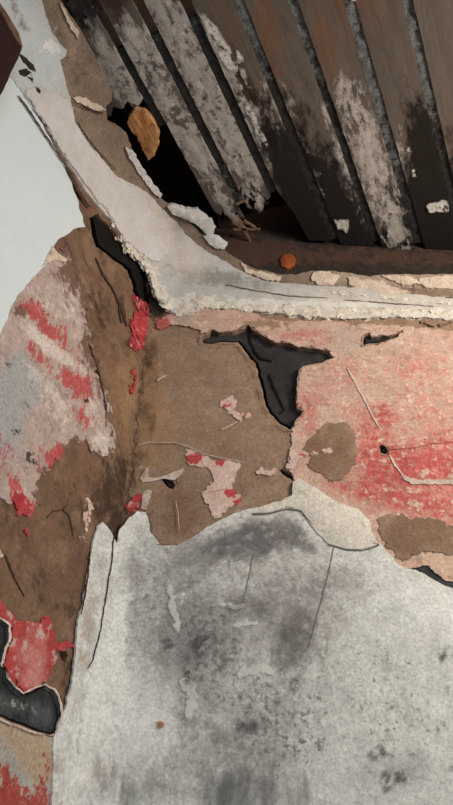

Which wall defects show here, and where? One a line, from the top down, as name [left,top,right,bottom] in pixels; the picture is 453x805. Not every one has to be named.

flaking render [60,3,80,38]
flaking render [73,96,105,111]
efflorescence [124,25,176,112]
efflorescence [154,0,263,218]
efflorescence [242,99,268,145]
efflorescence [335,220,349,232]
efflorescence [338,77,410,249]
efflorescence [427,200,448,213]
peeling [0,245,116,539]
flaking render [91,217,453,588]
crack [308,547,334,648]
peeling [0,599,74,736]